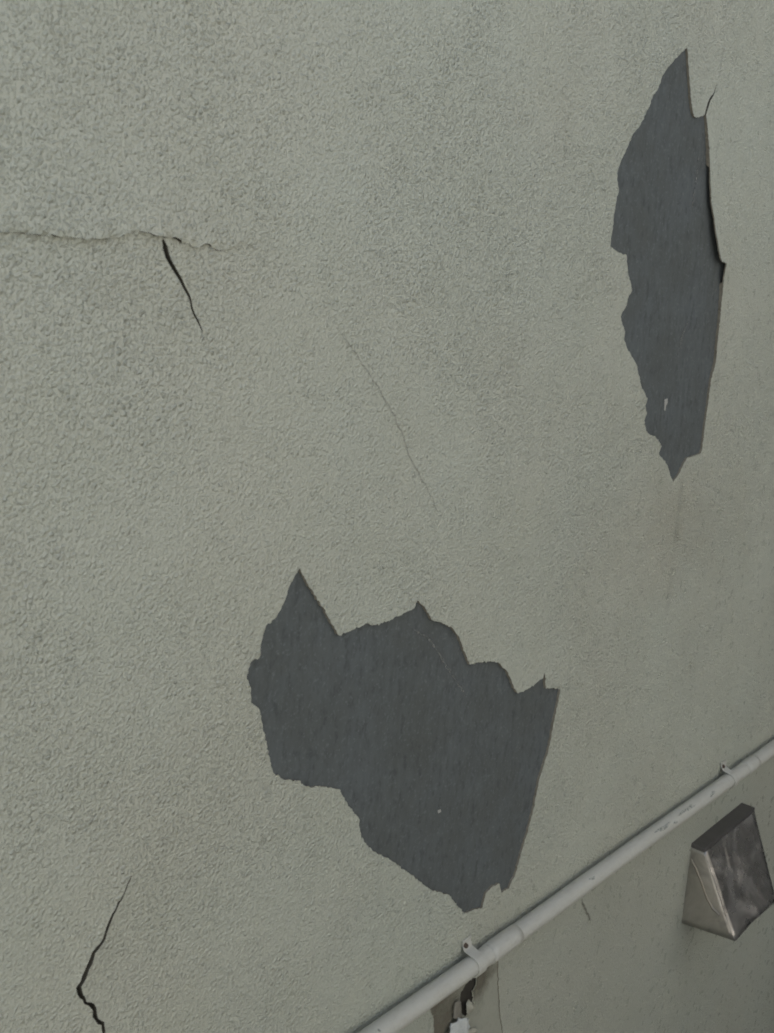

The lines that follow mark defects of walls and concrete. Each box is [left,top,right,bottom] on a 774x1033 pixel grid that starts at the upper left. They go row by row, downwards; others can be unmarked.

crack [131,231,250,333]
peeling [610,48,727,482]
peeling [247,568,560,913]
crack [76,875,132,1033]
spalling [430,961,503,1033]